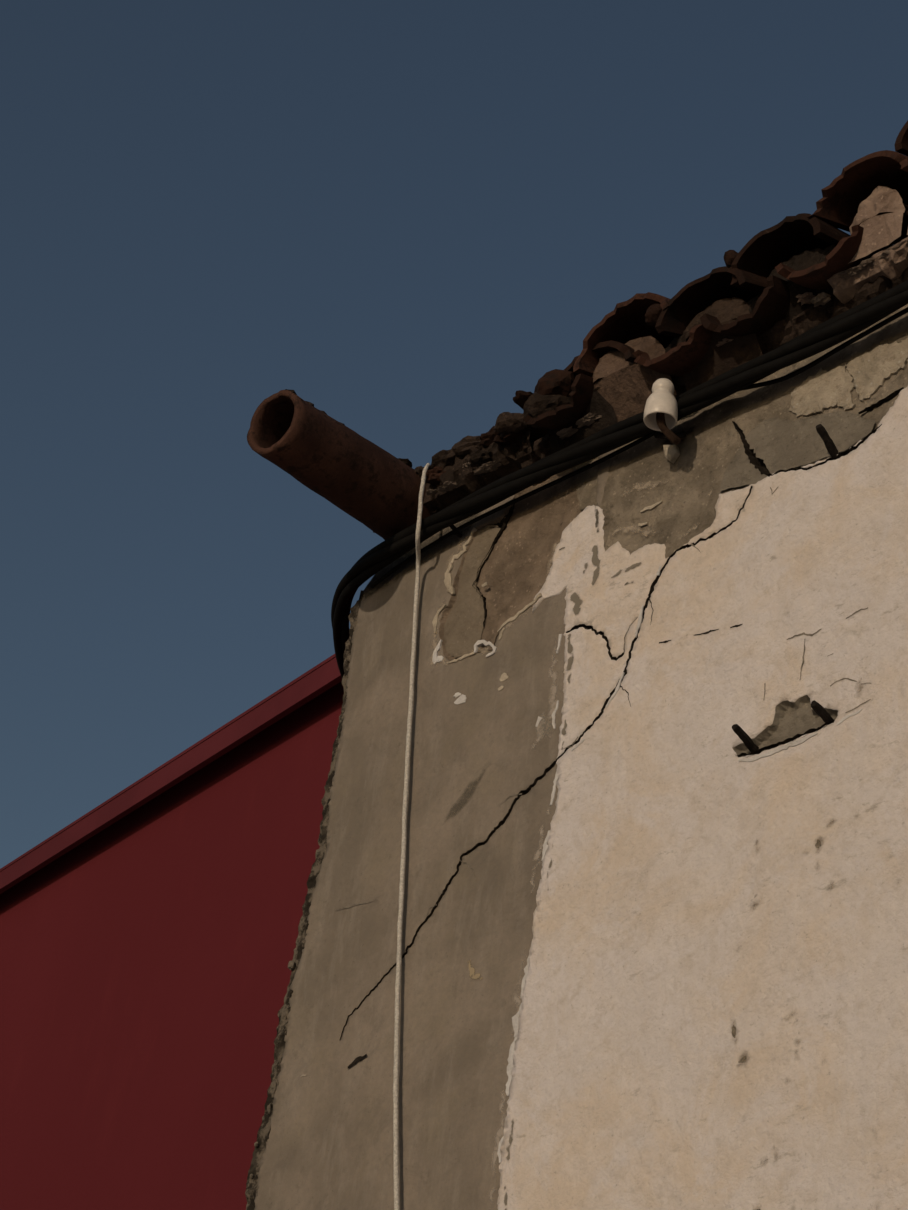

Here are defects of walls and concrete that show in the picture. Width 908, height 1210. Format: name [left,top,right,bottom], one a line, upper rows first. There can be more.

peeling [548,771,558,814]
peeling [534,634,574,750]
crack [340,387,904,1068]
spalling [732,695,862,762]
spalling [245,590,364,1210]
peeling [492,956,529,1168]